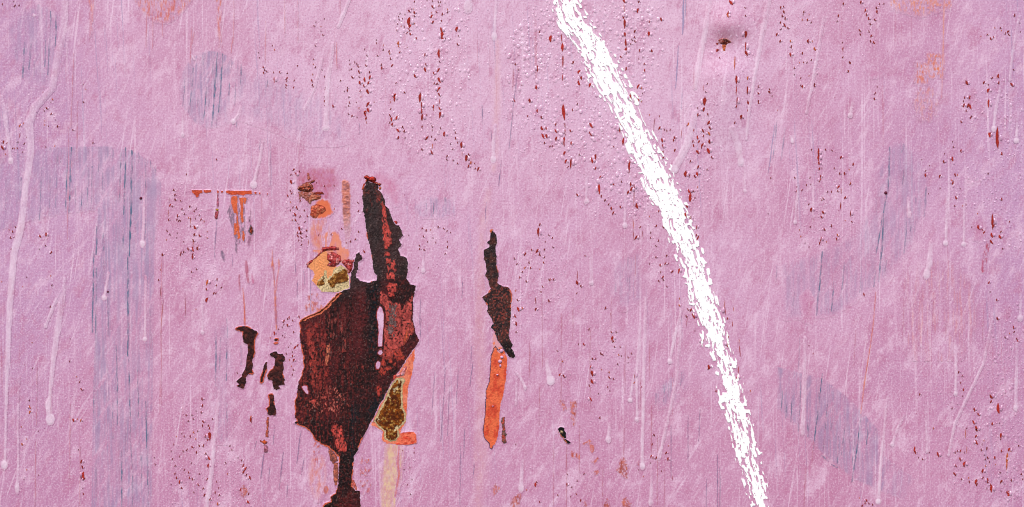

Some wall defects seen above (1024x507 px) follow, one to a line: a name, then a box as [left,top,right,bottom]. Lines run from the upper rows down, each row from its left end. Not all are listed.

corrosion [297,162,345,250]
peeling [234,168,451,507]
spalling [257,0,697,327]
corrosion [471,184,501,507]
peeling [481,223,676,507]